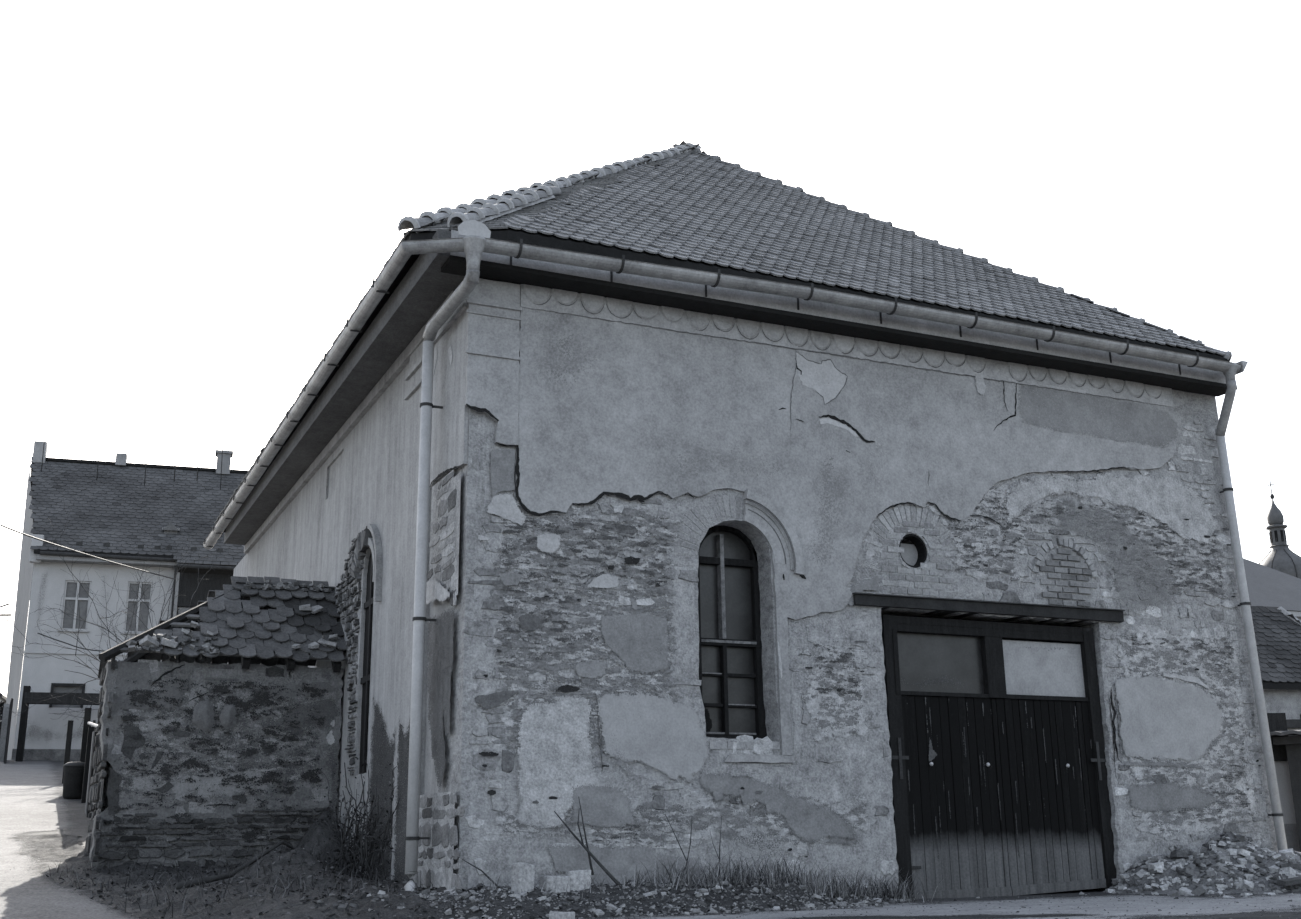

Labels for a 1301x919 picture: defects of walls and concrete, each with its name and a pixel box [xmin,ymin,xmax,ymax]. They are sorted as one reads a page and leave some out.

flaking render [796,351,858,437]
crack [779,360,875,453]
spalling [414,413,895,890]
spalling [955,415,1274,874]
flaking render [121,725,163,769]
spalling [95,794,334,869]